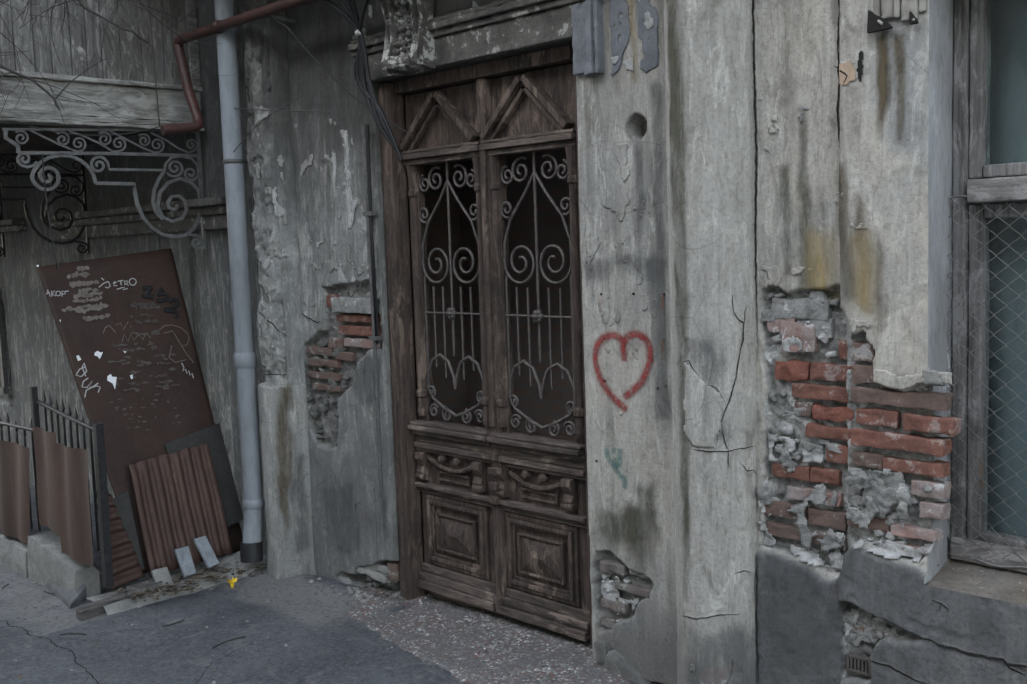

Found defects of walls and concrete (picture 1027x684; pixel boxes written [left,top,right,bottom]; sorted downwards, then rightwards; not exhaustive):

flaking render [254,106,270,126]
peeling [609,0,659,76]
crack [834,0,848,149]
flaking render [254,155,287,225]
flaking render [300,118,367,233]
crack [682,0,761,475]
spalling [258,227,382,446]
spalling [757,265,961,570]
crack [7,621,174,684]
spalling [599,559,653,629]
crack [681,556,761,684]